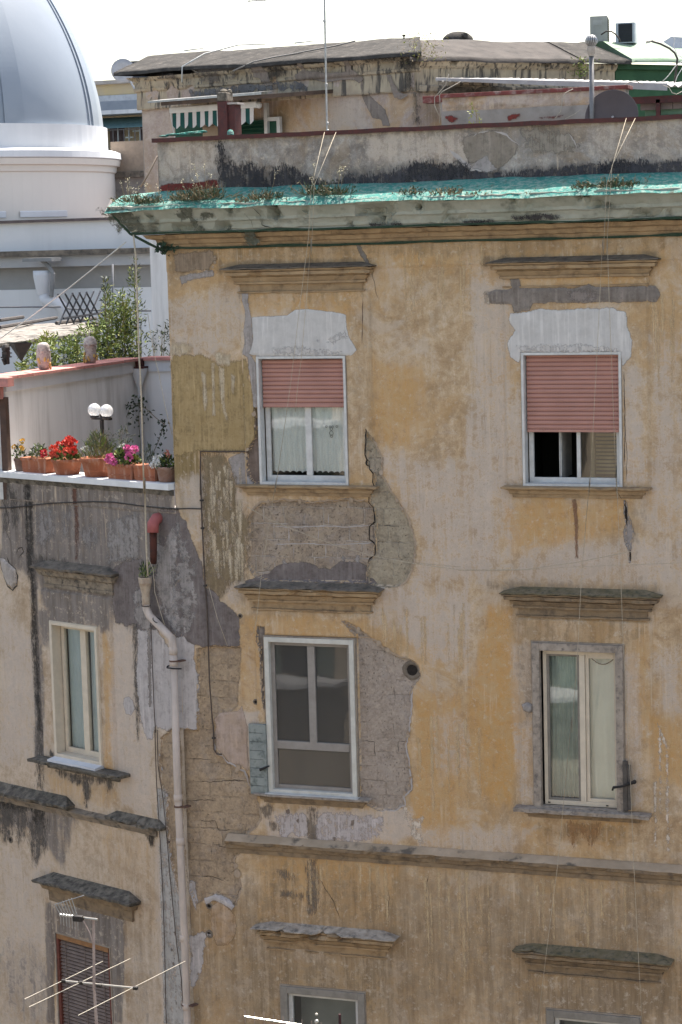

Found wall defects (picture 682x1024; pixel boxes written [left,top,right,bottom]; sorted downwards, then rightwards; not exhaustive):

damp [215,140,682,187]
spalling [450,114,580,172]
flaking render [171,340,417,600]
spalling [623,500,635,564]
spalling [275,621,421,842]
flaking render [159,646,262,909]
damp [0,801,51,867]